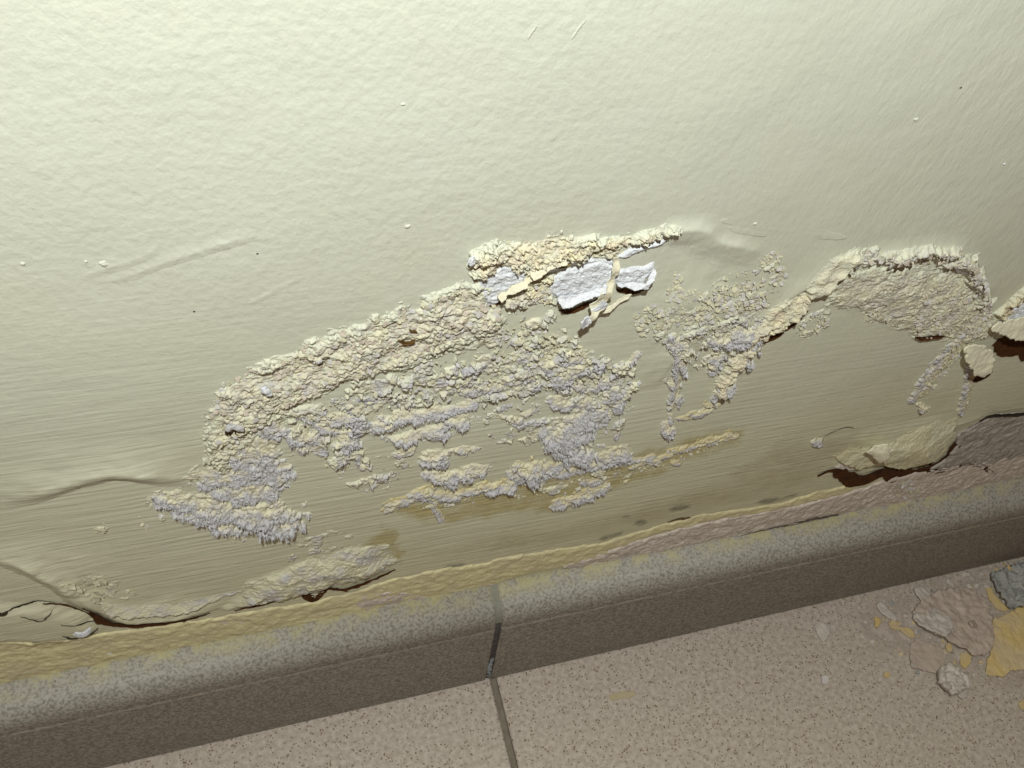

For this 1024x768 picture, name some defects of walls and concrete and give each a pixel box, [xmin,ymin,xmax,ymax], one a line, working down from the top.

flaking render [200,223,683,479]
damp [148,326,766,543]
flaking render [562,412,1024,569]
flaking render [633,243,1024,400]
damp [907,334,976,416]